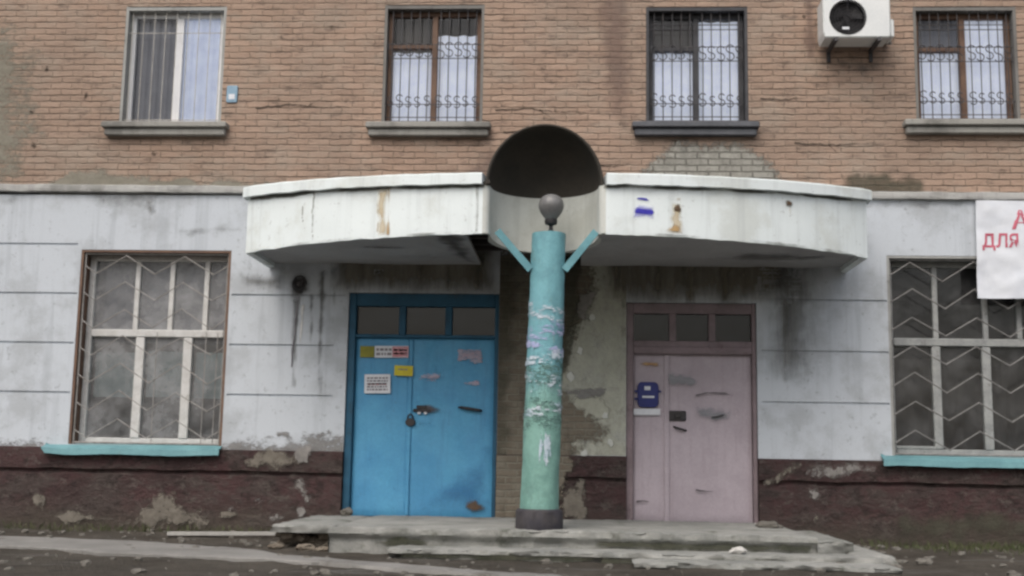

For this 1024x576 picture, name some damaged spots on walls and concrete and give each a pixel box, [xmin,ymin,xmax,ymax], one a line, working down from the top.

corrosion [379,192,389,234]
corrosion [670,204,681,231]
flaking render [495,251,531,518]
flaking render [539,252,613,519]
peeling [222,431,343,471]
flaking render [764,463,875,485]
flaking render [56,510,103,524]
flaking render [127,492,236,530]